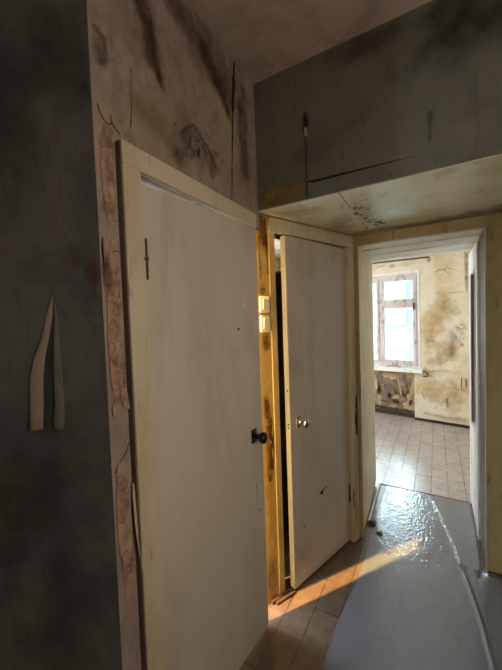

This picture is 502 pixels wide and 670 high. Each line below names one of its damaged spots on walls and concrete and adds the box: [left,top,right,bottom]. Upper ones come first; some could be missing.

leakage [172,0,233,116]
crack [229,61,237,201]
flaking render [374,371,415,411]